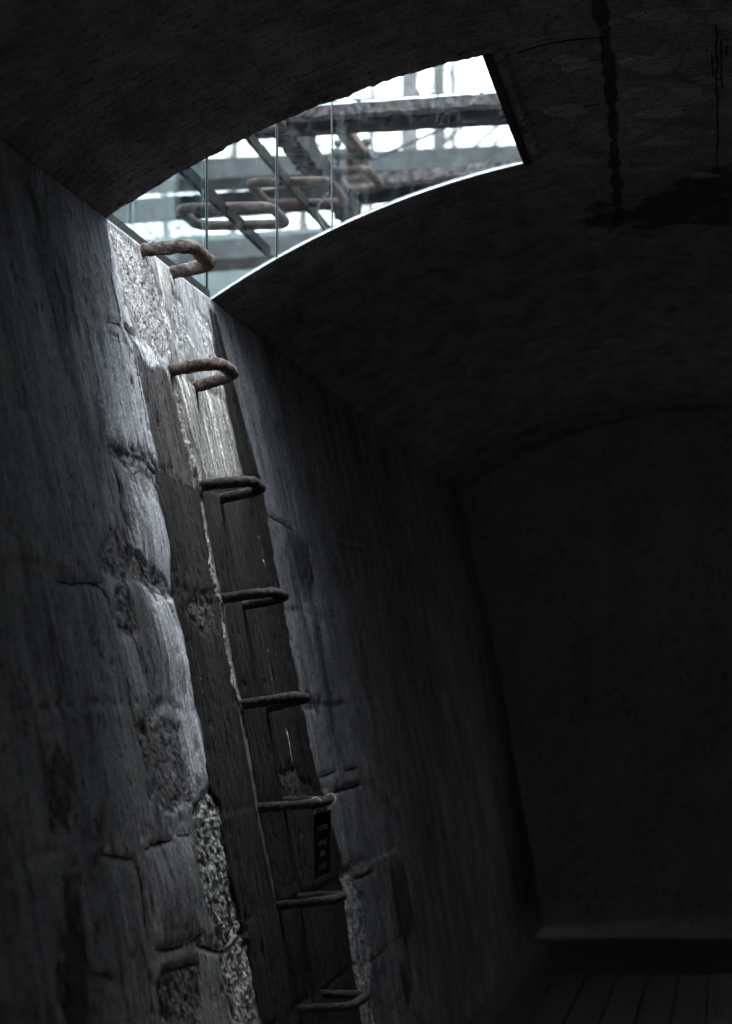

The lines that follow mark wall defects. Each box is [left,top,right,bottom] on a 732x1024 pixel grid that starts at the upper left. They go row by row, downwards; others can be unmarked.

water stain [583,0,732,229]
crack [711,25,727,181]
corrosion [201,307,362,1024]